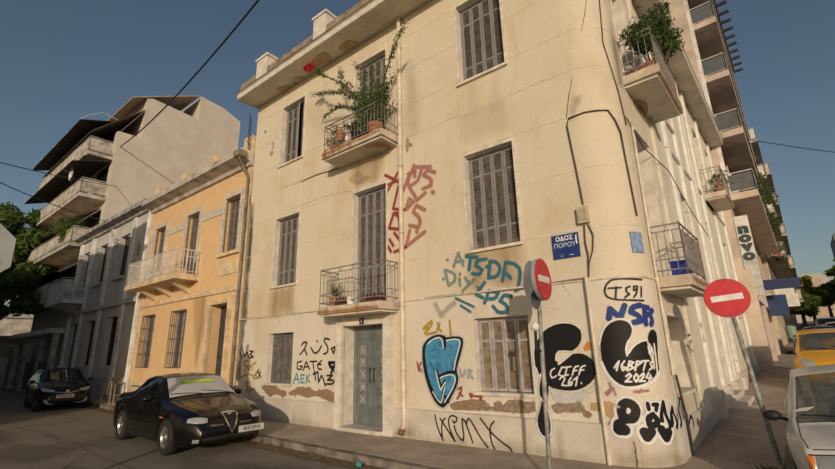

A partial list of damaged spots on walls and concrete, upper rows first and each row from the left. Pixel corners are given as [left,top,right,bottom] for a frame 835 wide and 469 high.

flaking render [262,385,334,403]
flaking render [450,399,536,414]